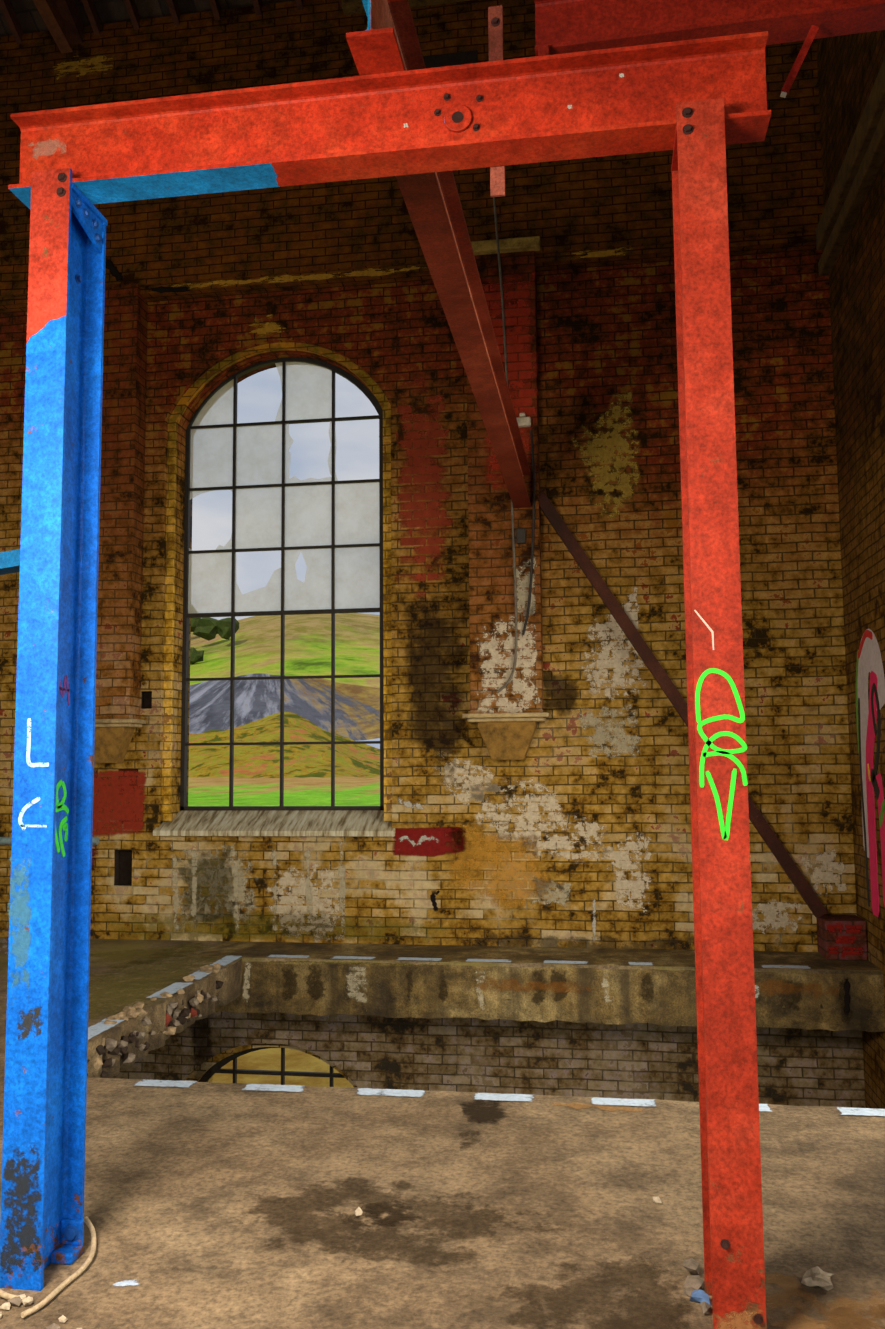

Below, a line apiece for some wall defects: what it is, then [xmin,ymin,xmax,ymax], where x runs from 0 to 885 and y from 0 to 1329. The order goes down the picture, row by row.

leakage [406,558,651,912]
flaking render [393,822,552,907]
leakage [243,963,251,999]
leakage [282,966,326,1000]
leakage [346,966,367,1002]
leakage [532,970,569,1004]
leakage [641,973,654,1001]
spalling [87,963,224,1078]
corrosion [0,1145,42,1274]